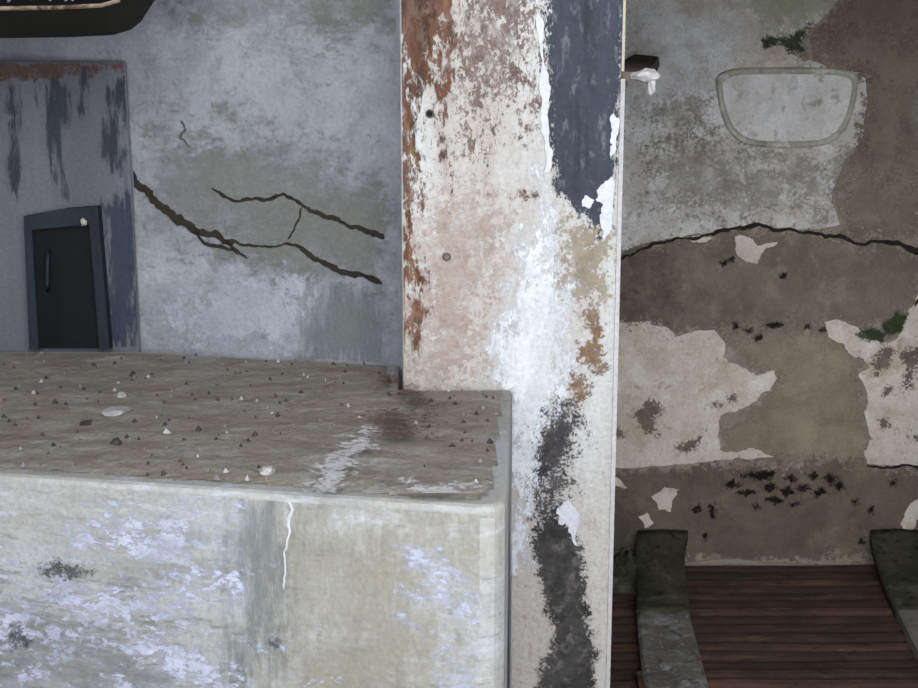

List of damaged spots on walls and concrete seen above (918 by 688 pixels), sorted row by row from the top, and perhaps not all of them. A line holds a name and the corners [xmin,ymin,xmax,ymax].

crack [133,171,385,284]
rust [401,0,551,357]
flaking render [535,0,868,489]
water stain [613,0,918,565]
crack [621,222,918,260]
flaking render [824,294,918,466]
water stain [0,495,293,688]
crack [282,502,294,590]
water stain [301,538,468,688]
flaking render [639,513,653,528]
flaking render [651,486,680,512]
flaking render [901,499,918,530]